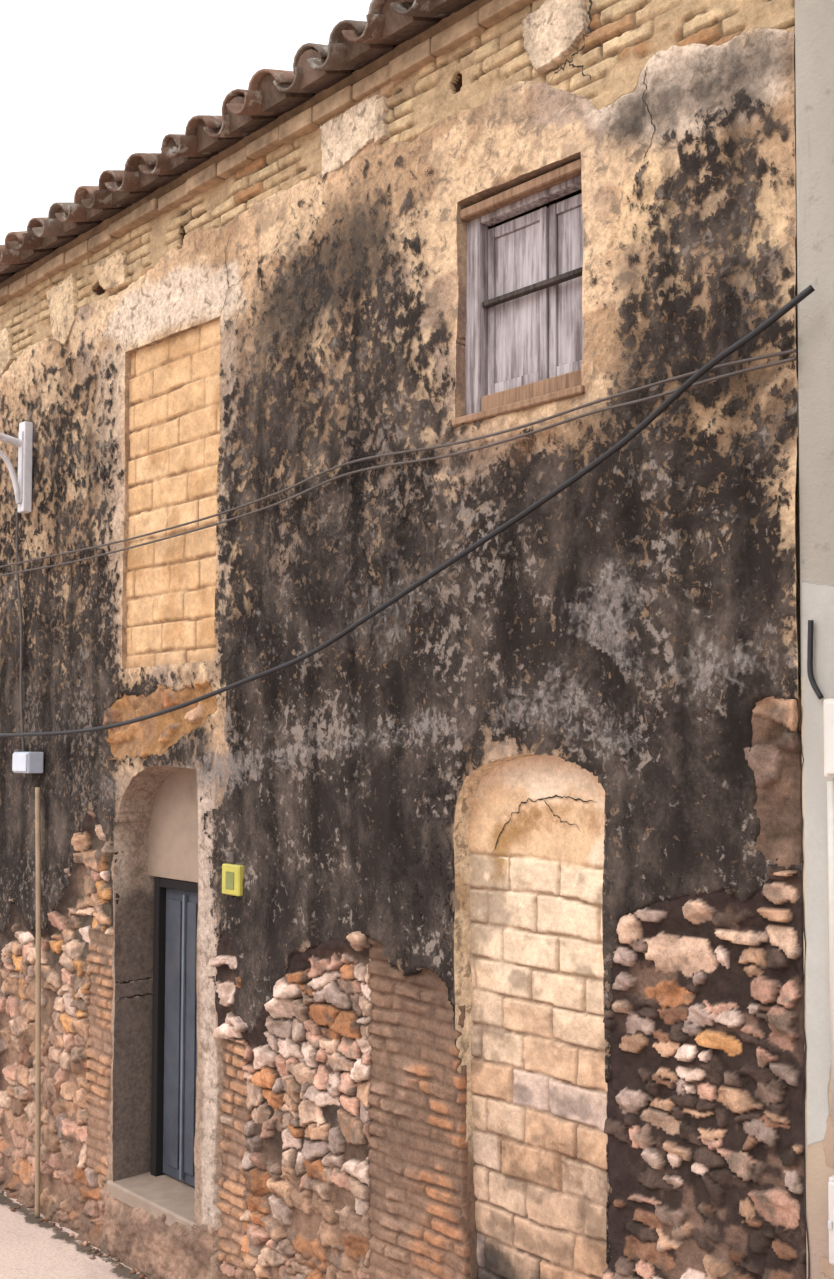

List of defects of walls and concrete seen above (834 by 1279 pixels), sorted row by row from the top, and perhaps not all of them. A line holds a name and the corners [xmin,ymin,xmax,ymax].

peeling [0,0,795,377]
water stain [0,87,802,1083]
crack [492,795,594,855]
crack [799,680,810,1279]